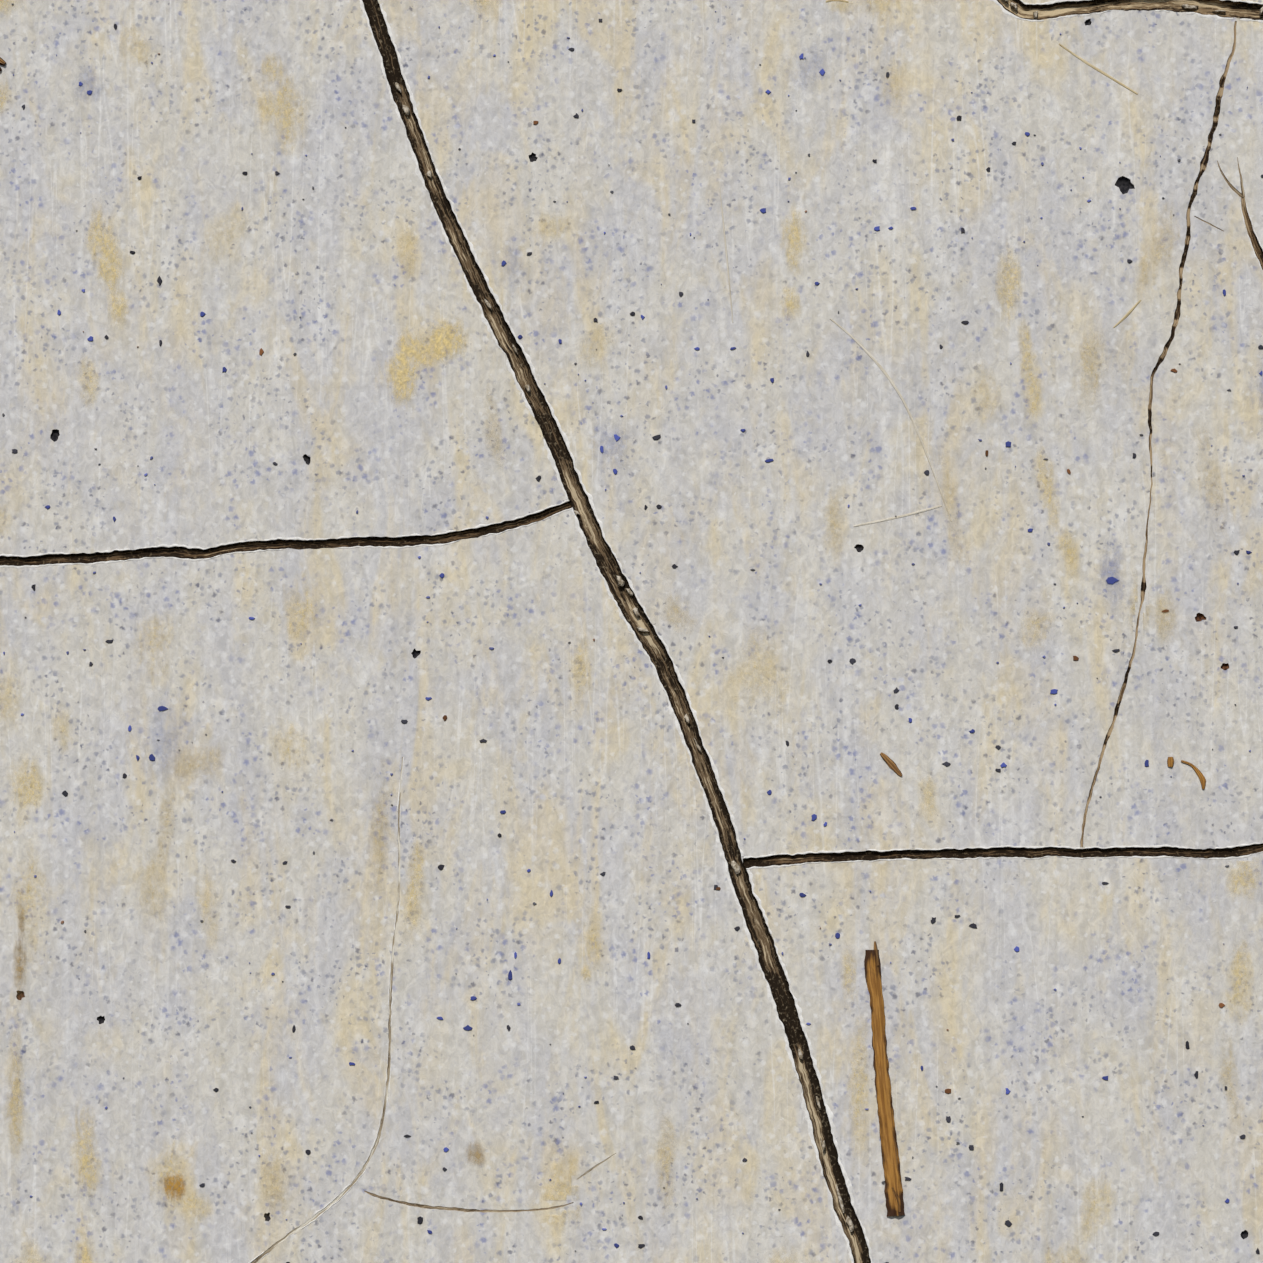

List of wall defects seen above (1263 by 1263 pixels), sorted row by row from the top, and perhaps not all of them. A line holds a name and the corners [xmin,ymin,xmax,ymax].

crack [990,0,1263,23]
crack [0,0,873,1263]
crack [743,21,1263,869]